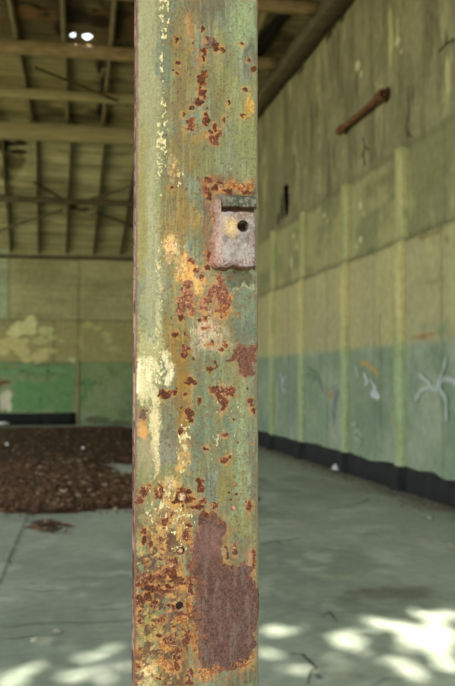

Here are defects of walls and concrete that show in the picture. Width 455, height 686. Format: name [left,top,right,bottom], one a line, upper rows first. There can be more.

rust [183,25,231,146]
rust [199,176,253,201]
rust [171,243,239,331]
rust [203,339,258,377]
peeling [138,290,173,469]
rust [157,376,198,399]
rust [178,397,201,435]
rust [209,382,237,423]
rust [134,474,259,686]